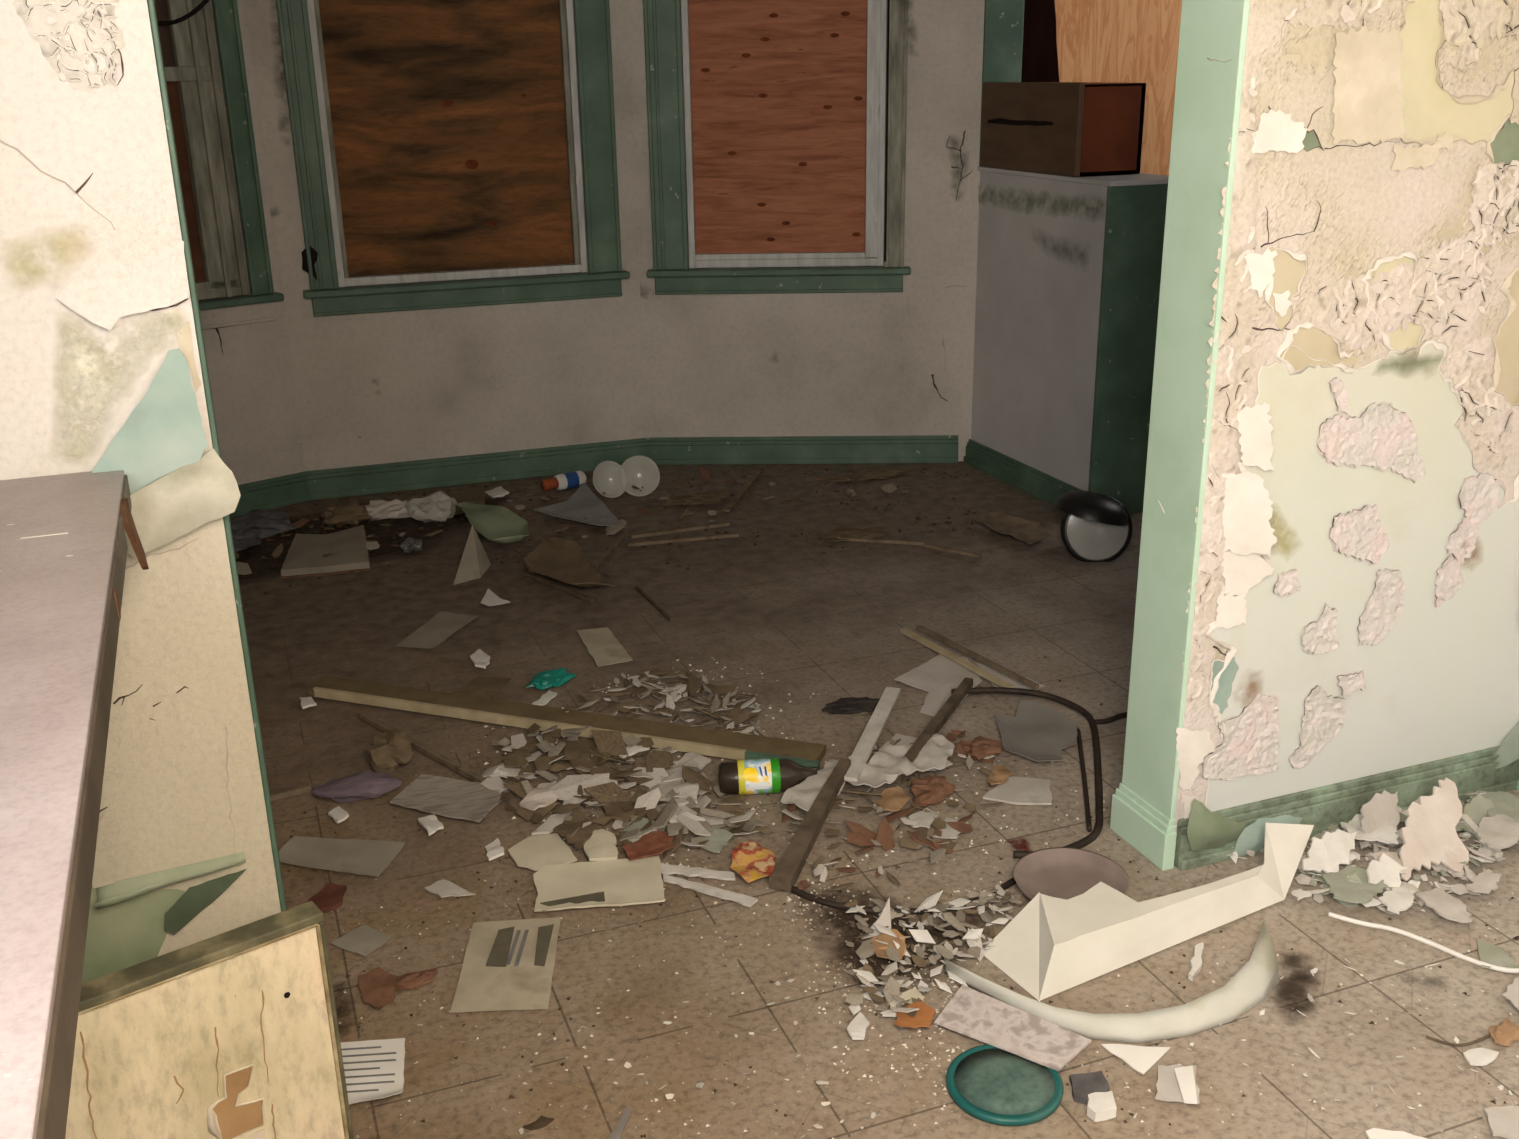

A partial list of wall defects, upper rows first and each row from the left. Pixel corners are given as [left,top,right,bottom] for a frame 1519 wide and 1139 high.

crack [0,140,115,230]
peeling [1176,0,1519,864]
peeling [82,793,246,984]